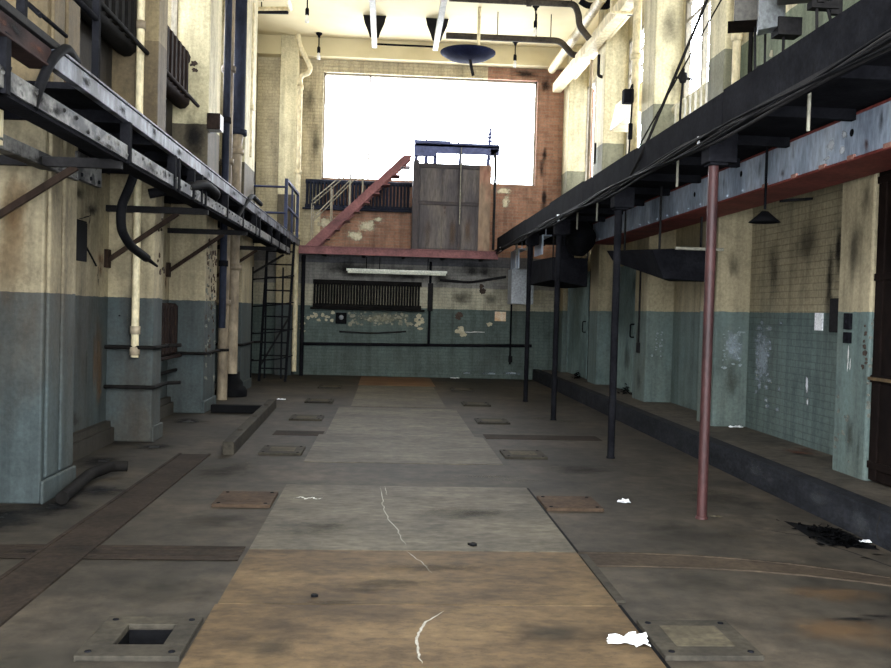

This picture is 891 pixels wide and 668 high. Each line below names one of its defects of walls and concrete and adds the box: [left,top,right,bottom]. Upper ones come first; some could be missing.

peeling [204,238,217,382]
peeling [304,310,335,332]
peeling [348,311,424,330]
crack [380,486,432,573]
crack [415,612,442,663]